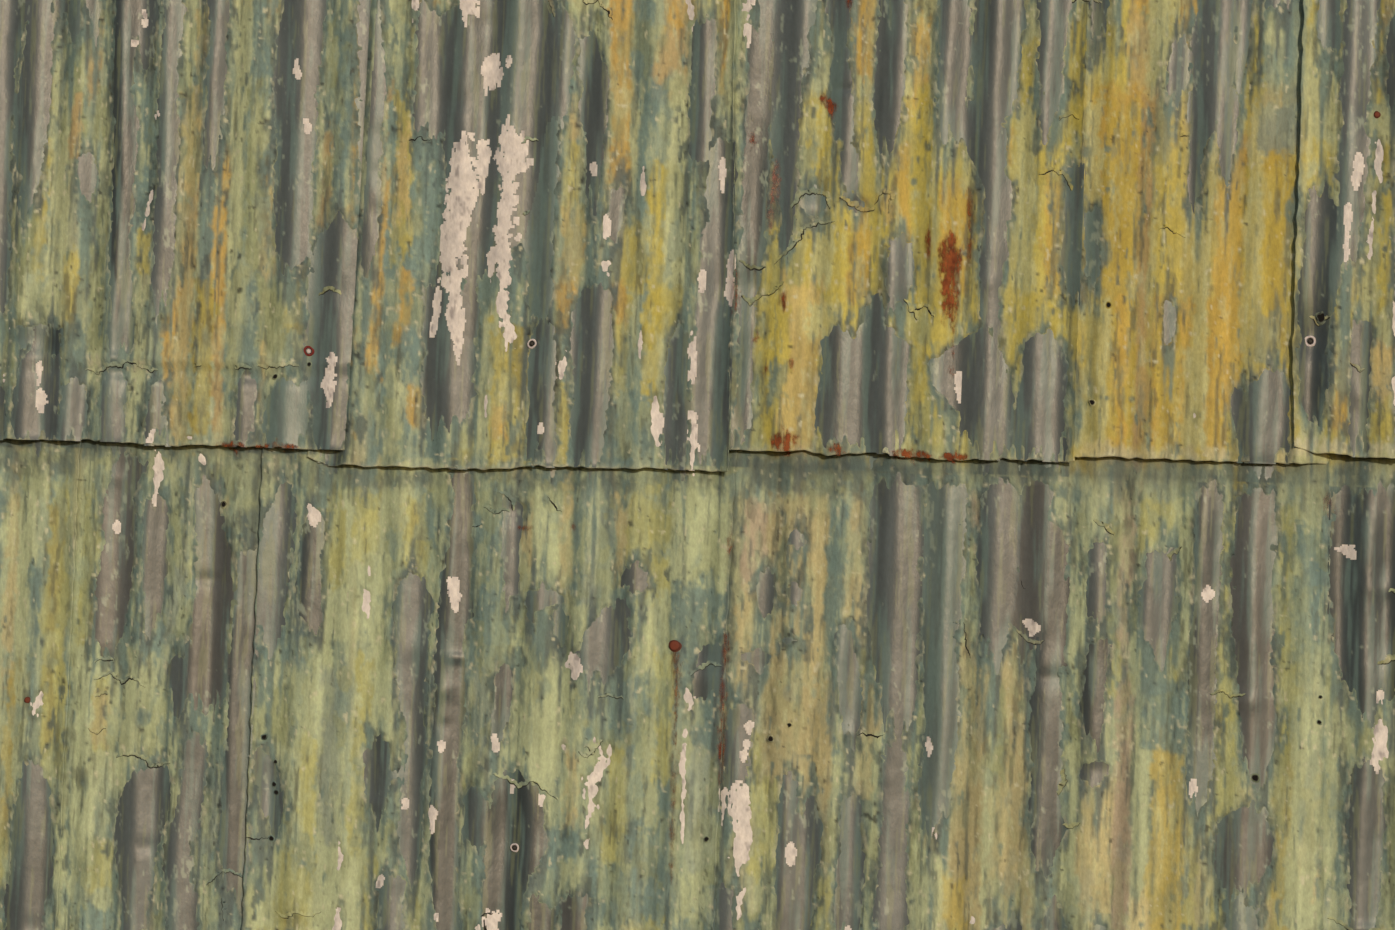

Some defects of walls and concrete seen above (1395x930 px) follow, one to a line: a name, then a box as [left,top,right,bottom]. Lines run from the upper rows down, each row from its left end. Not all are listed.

peeling [411,0,647,479]
peeling [651,0,865,481]
corrosion [925,229,971,330]
corrosion [771,432,797,454]
corrosion [893,449,967,463]
peeling [774,0,1112,930]
peeling [4,759,55,930]
peeling [114,454,325,930]
peeling [362,465,588,930]
peeling [581,737,612,849]
peeling [679,729,688,844]
peeling [684,642,771,930]